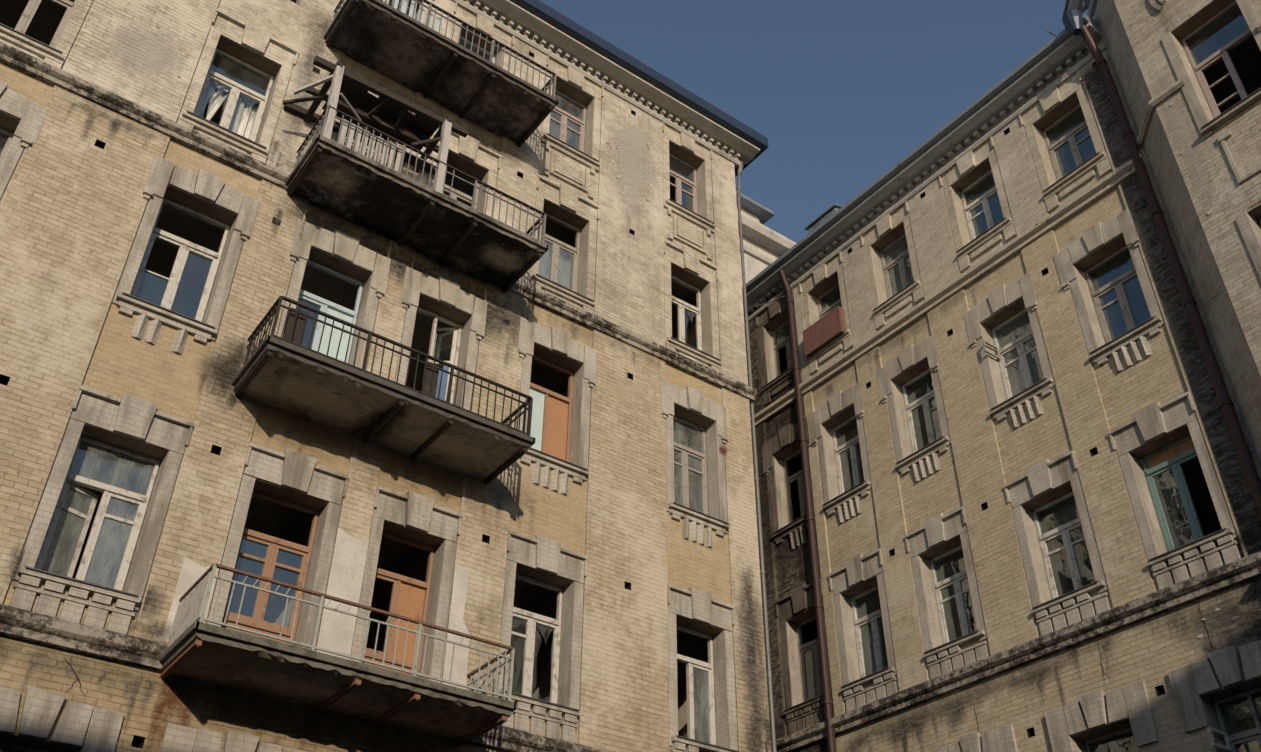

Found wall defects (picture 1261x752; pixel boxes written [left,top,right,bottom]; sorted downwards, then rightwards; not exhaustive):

leakage [1067,70,1102,99]
leakage [739,574,771,752]
leakage [1168,588,1261,668]